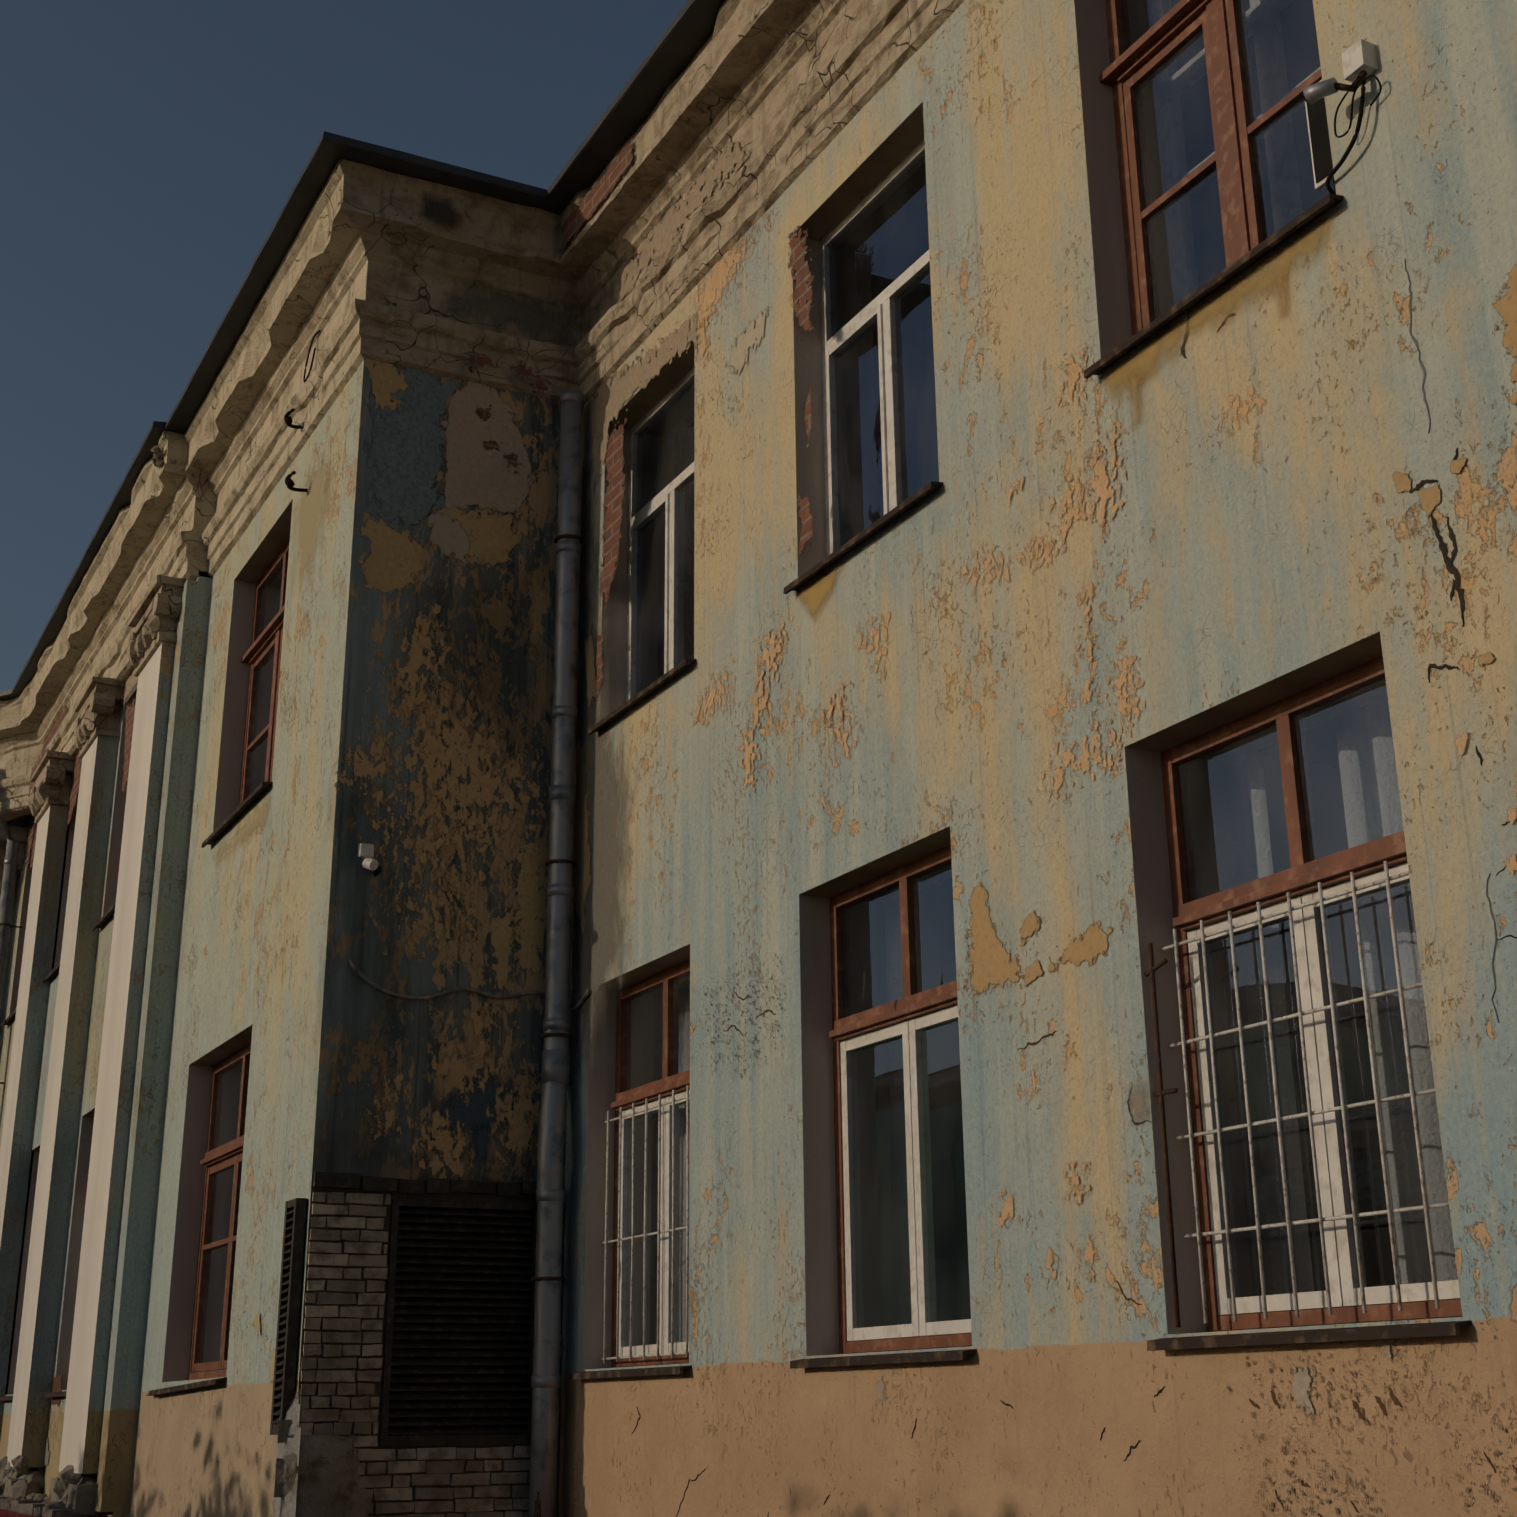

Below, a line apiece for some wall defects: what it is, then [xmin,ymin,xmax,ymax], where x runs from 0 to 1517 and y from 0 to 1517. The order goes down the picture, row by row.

peeling [364,358,408,415]
flaking render [587,236,772,609]
flaking render [787,225,815,341]
peeling [959,414,1126,602]
crack [1393,259,1495,683]
peeling [1492,264,1517,405]
peeling [323,381,552,1179]
peeling [690,613,788,796]
peeling [1036,576,1145,804]
peeling [964,882,1113,996]
crack [1454,732,1517,1023]
crack [676,1468,706,1517]